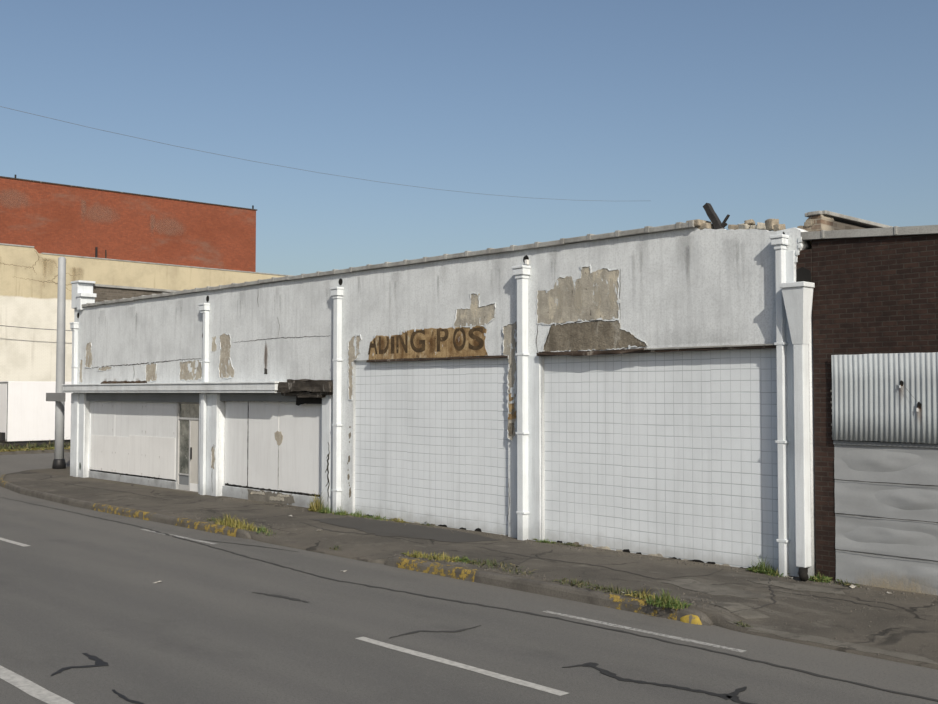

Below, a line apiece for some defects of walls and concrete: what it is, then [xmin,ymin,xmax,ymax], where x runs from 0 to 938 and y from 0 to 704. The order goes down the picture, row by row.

peeling [535,265,648,352]
peeling [79,342,112,383]
peeling [145,362,157,383]
peeling [179,360,202,381]
peeling [211,331,234,380]
peeling [347,292,496,400]
peeling [502,322,517,442]
crack [323,443,331,497]